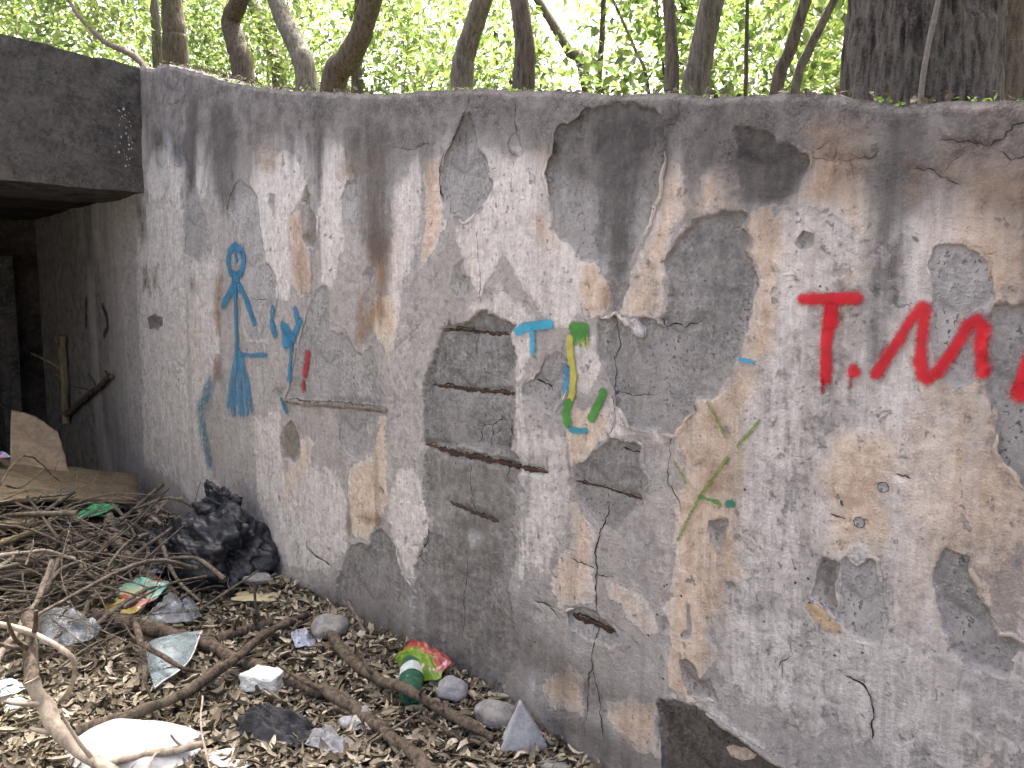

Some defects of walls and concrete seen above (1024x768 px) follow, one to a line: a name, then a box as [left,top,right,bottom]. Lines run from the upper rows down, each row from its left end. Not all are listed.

leakage [361,131,386,254]
peeling [441,112,493,225]
crack [913,122,1024,185]
crack [608,323,653,452]
peeling [542,101,814,534]
peeling [925,239,1024,490]
spalling [308,309,570,693]
crack [572,503,613,737]
peeling [805,551,889,645]
peeling [932,547,1024,678]
crack [845,675,874,739]